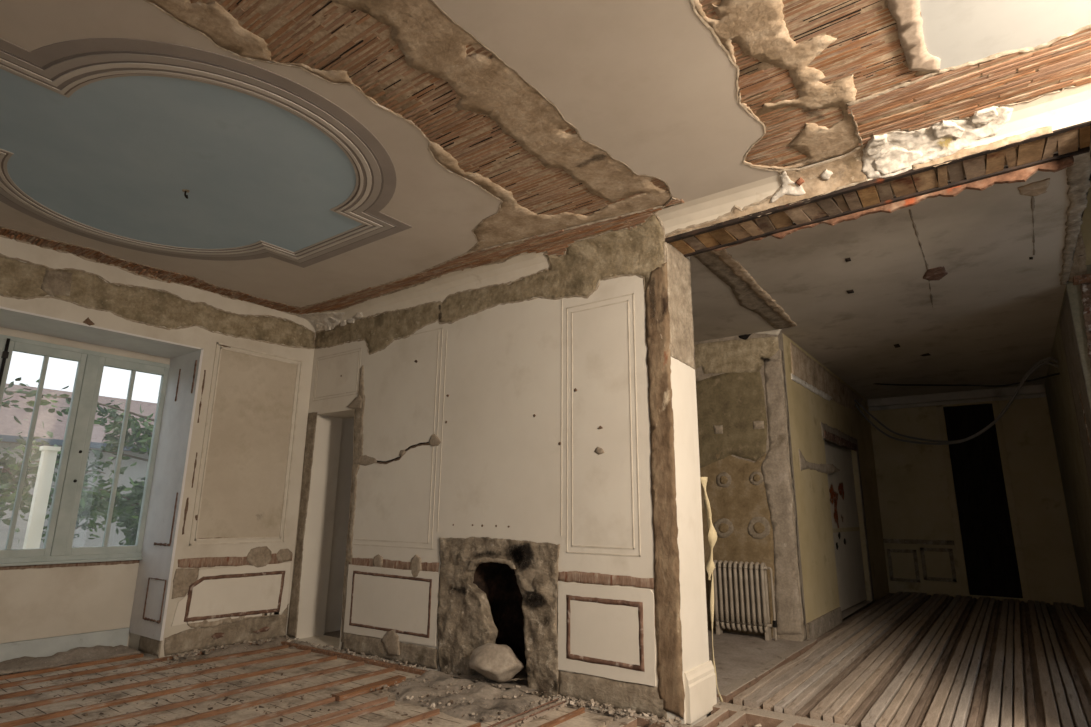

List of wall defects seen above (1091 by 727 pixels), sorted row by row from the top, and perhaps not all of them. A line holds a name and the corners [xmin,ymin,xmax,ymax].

flaking render [690,0,1091,179]
crack [354,434,441,466]
flaking render [0,0,868,720]
flaking render [1059,146,1091,491]